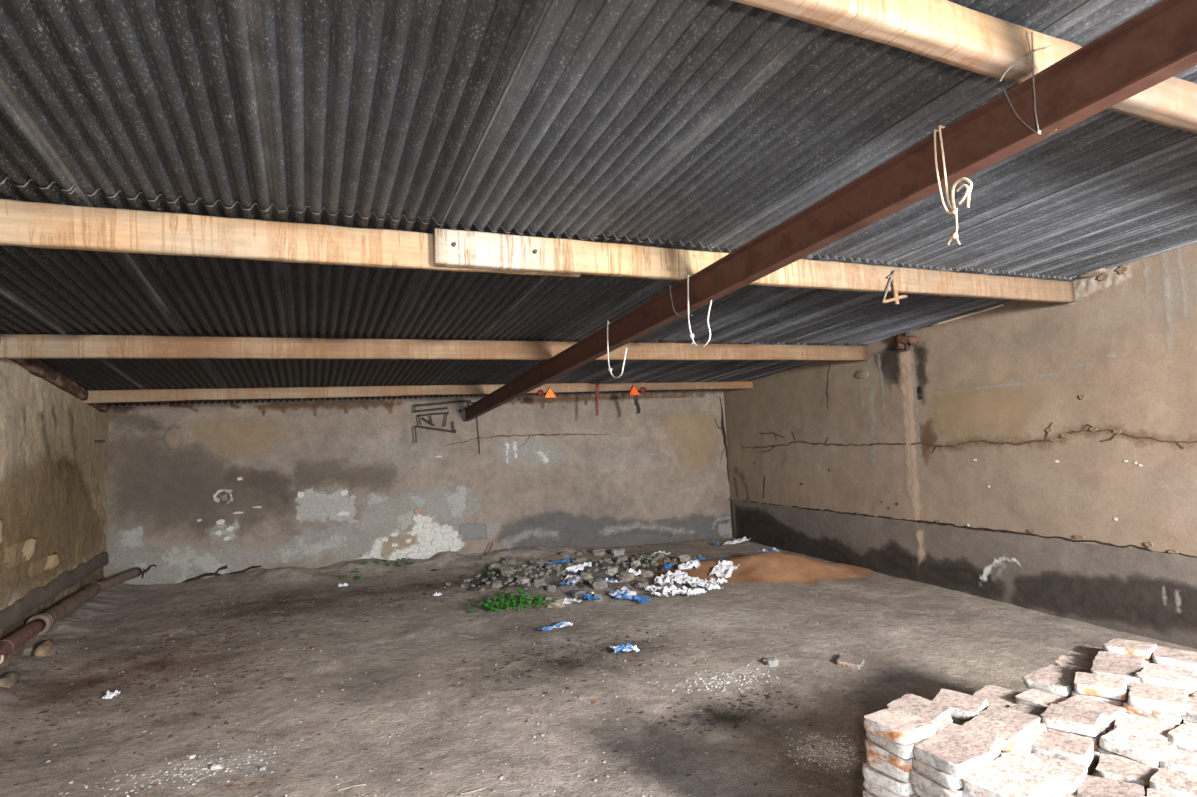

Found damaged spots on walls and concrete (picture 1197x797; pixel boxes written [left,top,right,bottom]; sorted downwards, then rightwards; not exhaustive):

corrosion [919,421,935,458]
peeling [295,488,359,524]
damp [499,345,1197,631]
crack [715,395,1197,558]
spalling [359,509,465,560]